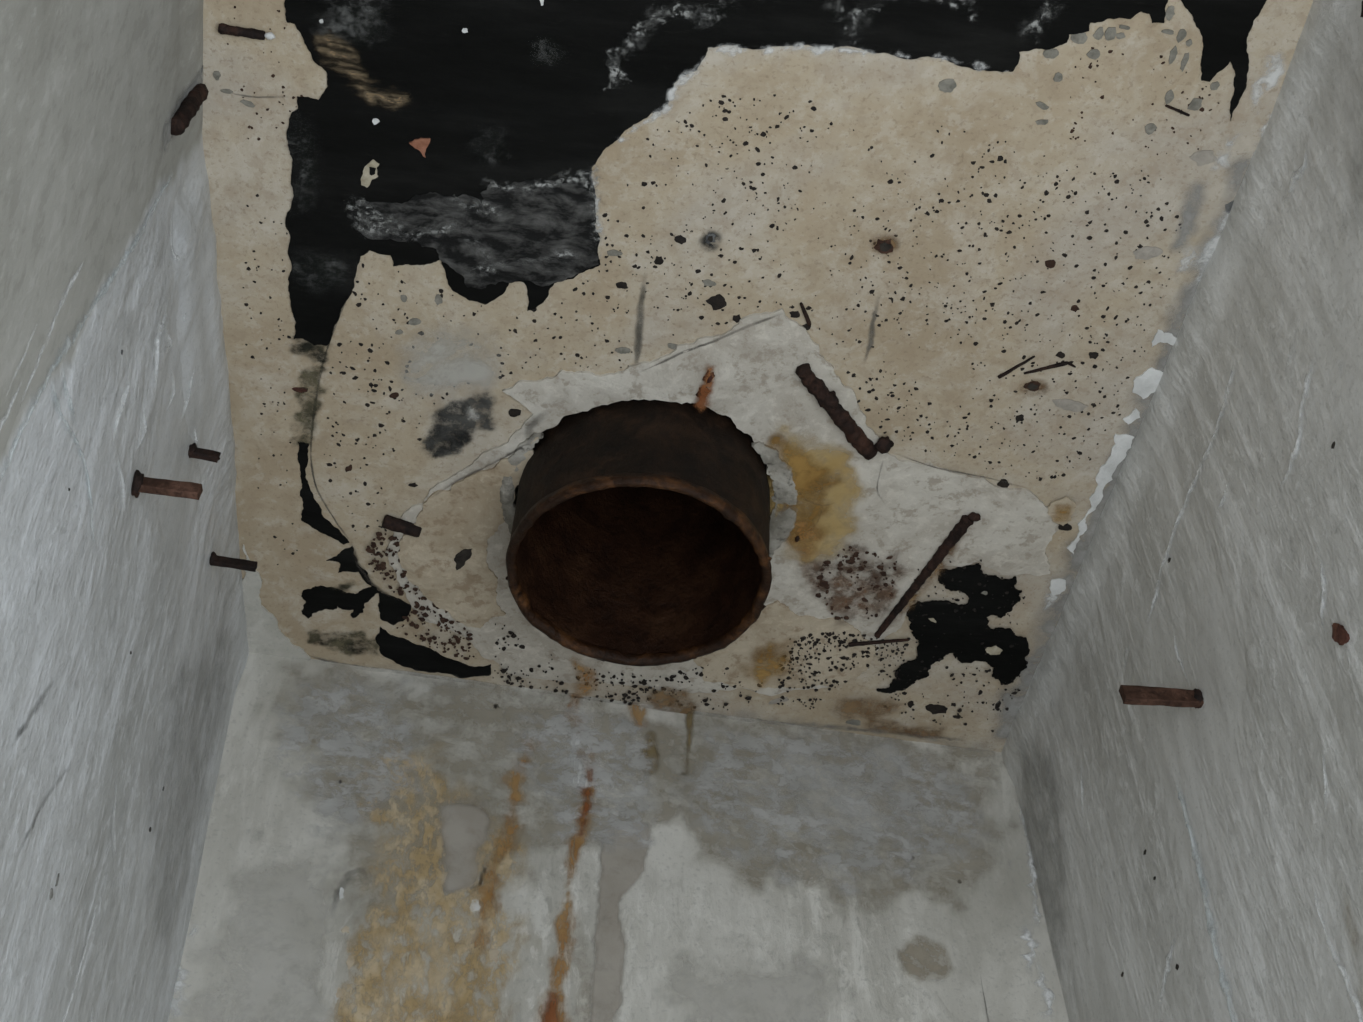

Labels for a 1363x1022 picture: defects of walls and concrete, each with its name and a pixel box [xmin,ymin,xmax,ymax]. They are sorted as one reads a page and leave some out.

rust [164,75,209,148]
spalling [361,160,379,187]
peeling [409,138,430,158]
rust [769,363,894,563]
peeling [1047,367,1163,554]
peeling [326,546,412,625]
spalling [454,549,472,570]
damp [809,546,904,620]
rust [874,512,981,638]
damp [996,393,1154,738]
damp [292,670,994,907]
rust [541,892,572,1022]